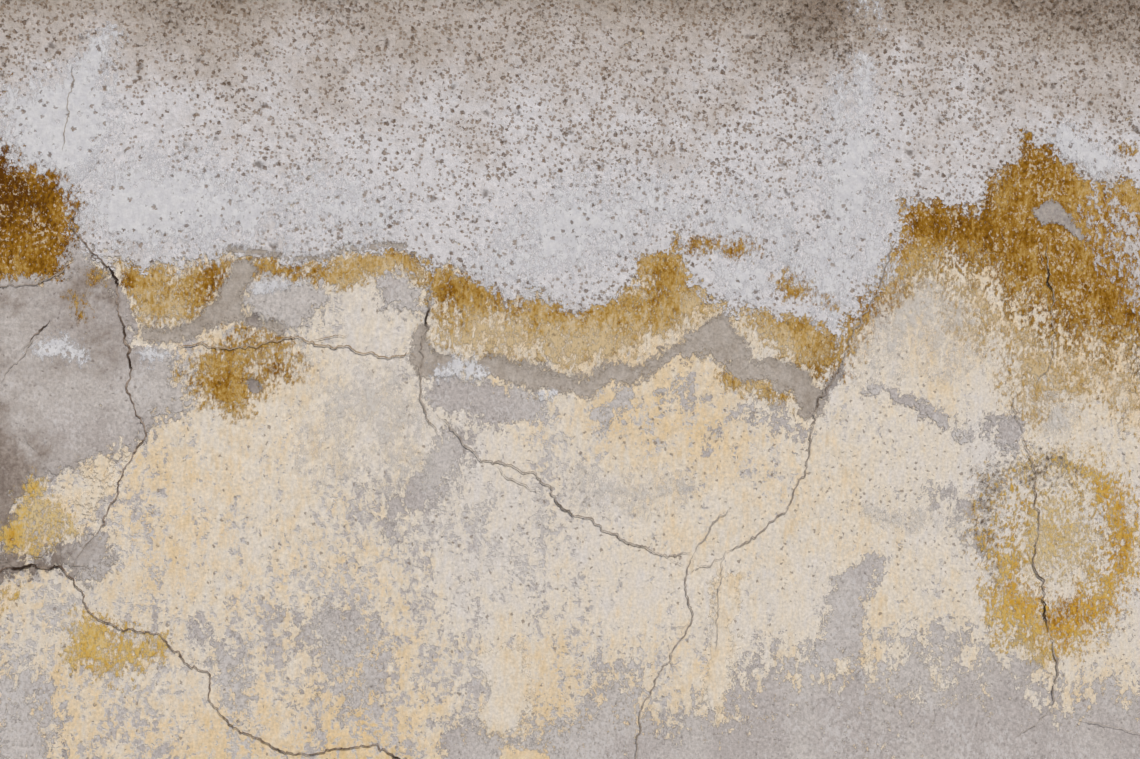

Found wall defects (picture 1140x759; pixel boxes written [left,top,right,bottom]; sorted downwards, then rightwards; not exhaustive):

damp [138,345,179,370]
crack [0,202,400,759]
damp [0,21,442,295]
crack [180,240,897,759]
peeling [0,0,1140,562]
damp [447,0,980,383]
peeling [431,551,1140,759]
damp [951,394,1140,673]
damp [1011,0,1140,48]
crack [1012,246,1140,737]